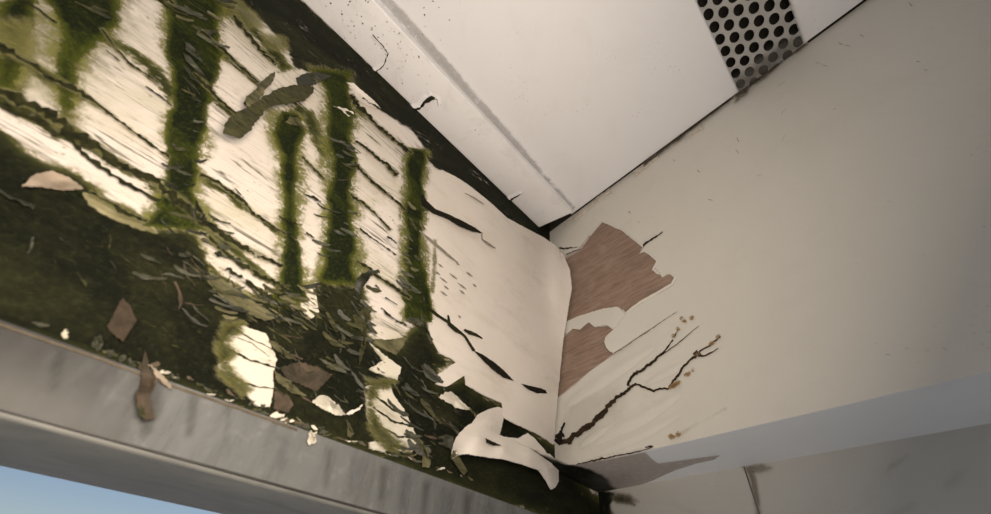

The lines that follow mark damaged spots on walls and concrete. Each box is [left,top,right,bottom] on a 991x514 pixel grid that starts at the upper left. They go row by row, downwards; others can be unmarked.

peeling [22,170,83,190]
crack [0,42,296,312]
crack [199,172,314,238]
peeling [223,71,331,139]
peeling [347,82,380,109]
crack [349,93,413,255]
leakage [240,0,550,242]
leakage [0,129,635,514]
peeling [269,269,407,438]
crack [356,231,483,351]
peeling [387,170,676,489]
crack [554,313,721,465]